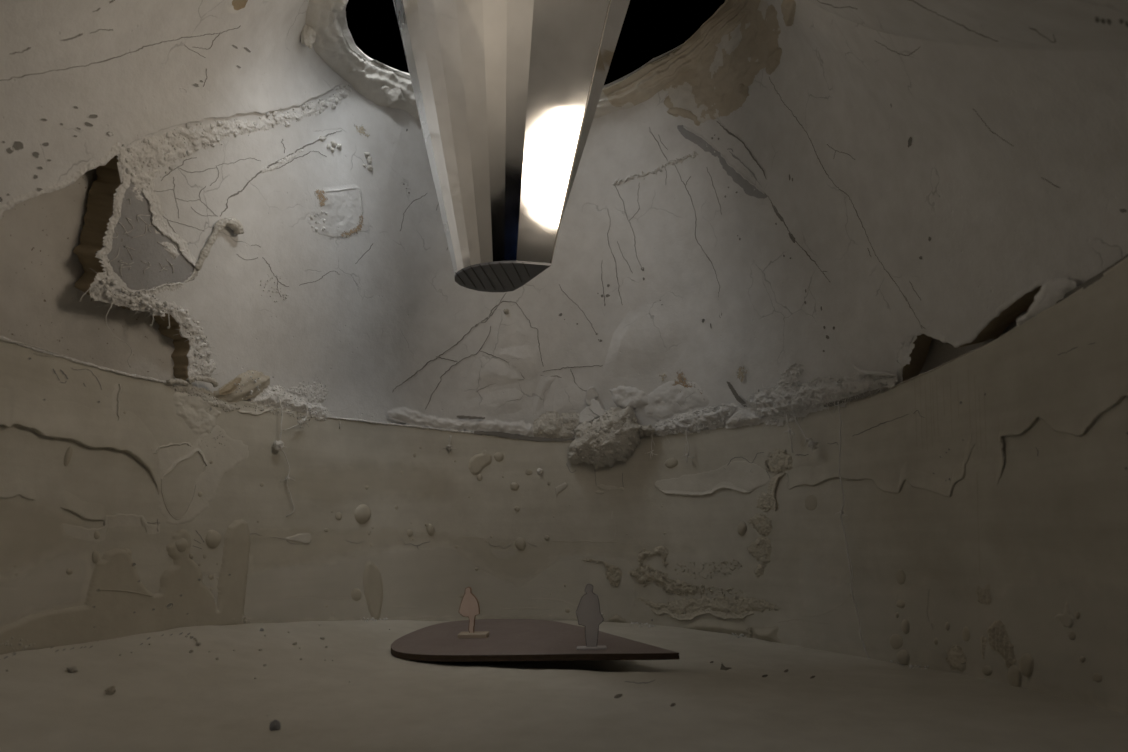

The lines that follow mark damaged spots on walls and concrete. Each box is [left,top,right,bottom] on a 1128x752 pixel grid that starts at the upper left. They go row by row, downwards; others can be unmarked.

peeling [39,55,353,297]
crack [236,243,374,296]
spalling [307,184,366,238]
crack [559,127,722,333]
peeling [0,387,161,495]
spalling [237,385,331,417]
spalling [387,407,534,437]
crack [392,293,603,410]
spalling [643,335,917,443]
spalling [583,546,699,596]